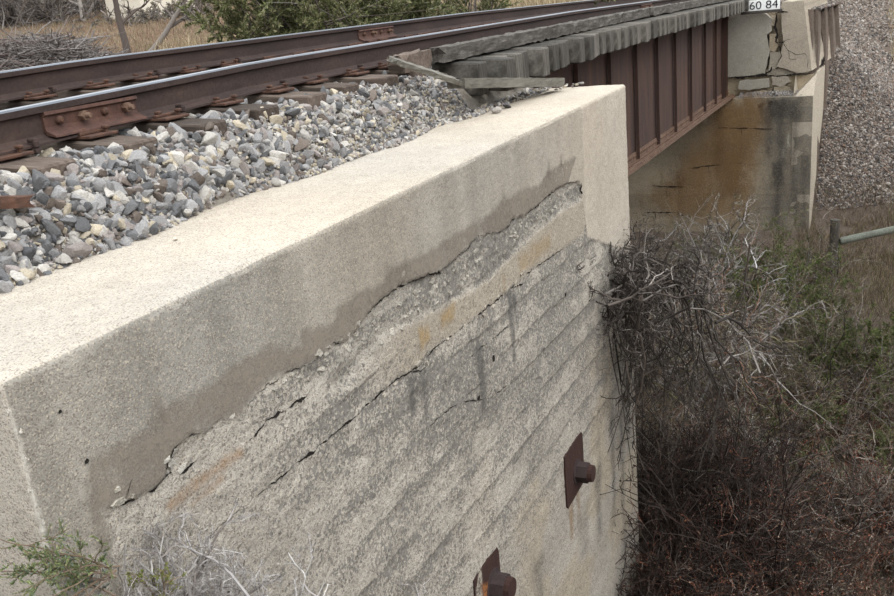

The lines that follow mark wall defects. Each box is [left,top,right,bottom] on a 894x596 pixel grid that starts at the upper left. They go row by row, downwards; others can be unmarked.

crack [731,11,825,79]
spalling [272,321,361,394]
leakage [91,159,575,548]
crack [199,249,562,558]
crack [227,174,583,440]
spalling [372,248,487,345]
spalling [111,486,136,508]
spalling [162,449,188,481]